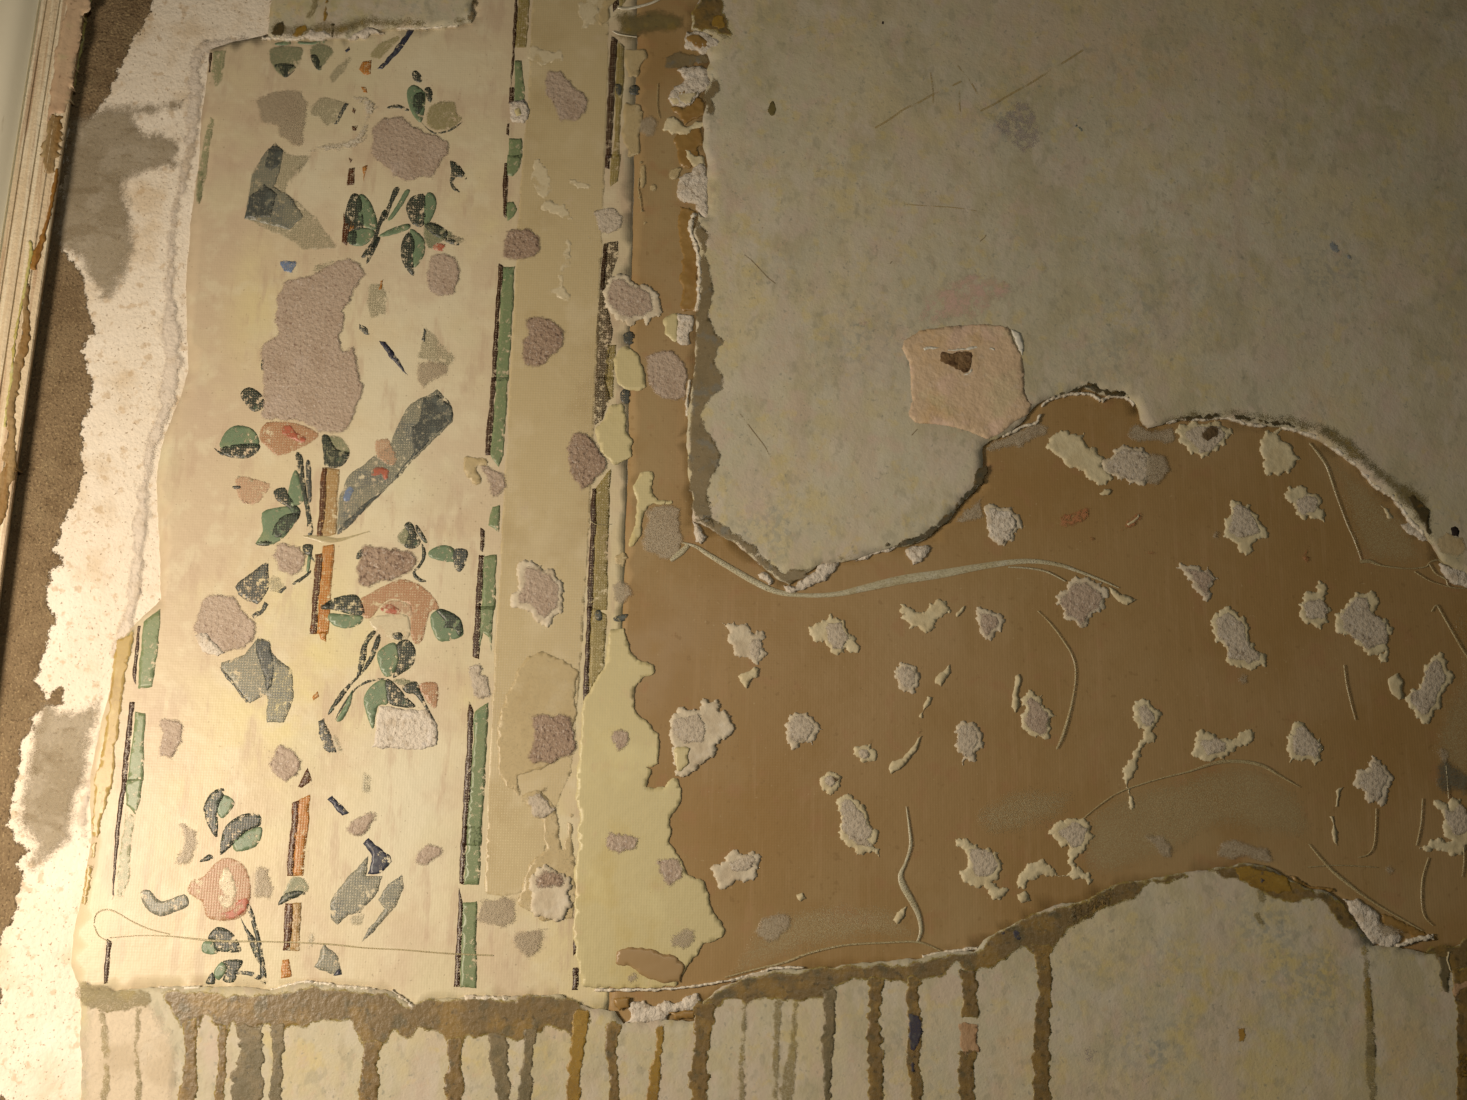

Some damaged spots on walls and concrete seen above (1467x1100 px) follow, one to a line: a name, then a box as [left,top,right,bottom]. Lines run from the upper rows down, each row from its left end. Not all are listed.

peeling [47,0,92,122]
leakage [0,0,154,945]
spalling [260,258,367,434]
spalling [567,273,694,490]
peeling [1046,430,1170,495]
spalling [1298,580,1455,724]
peeling [469,628,761,989]
spalling [955,818,1095,903]
leakage [75,981,624,1100]
leakage [646,1025,664,1100]
leakage [687,873,1188,1100]
leakage [1208,862,1377,1100]